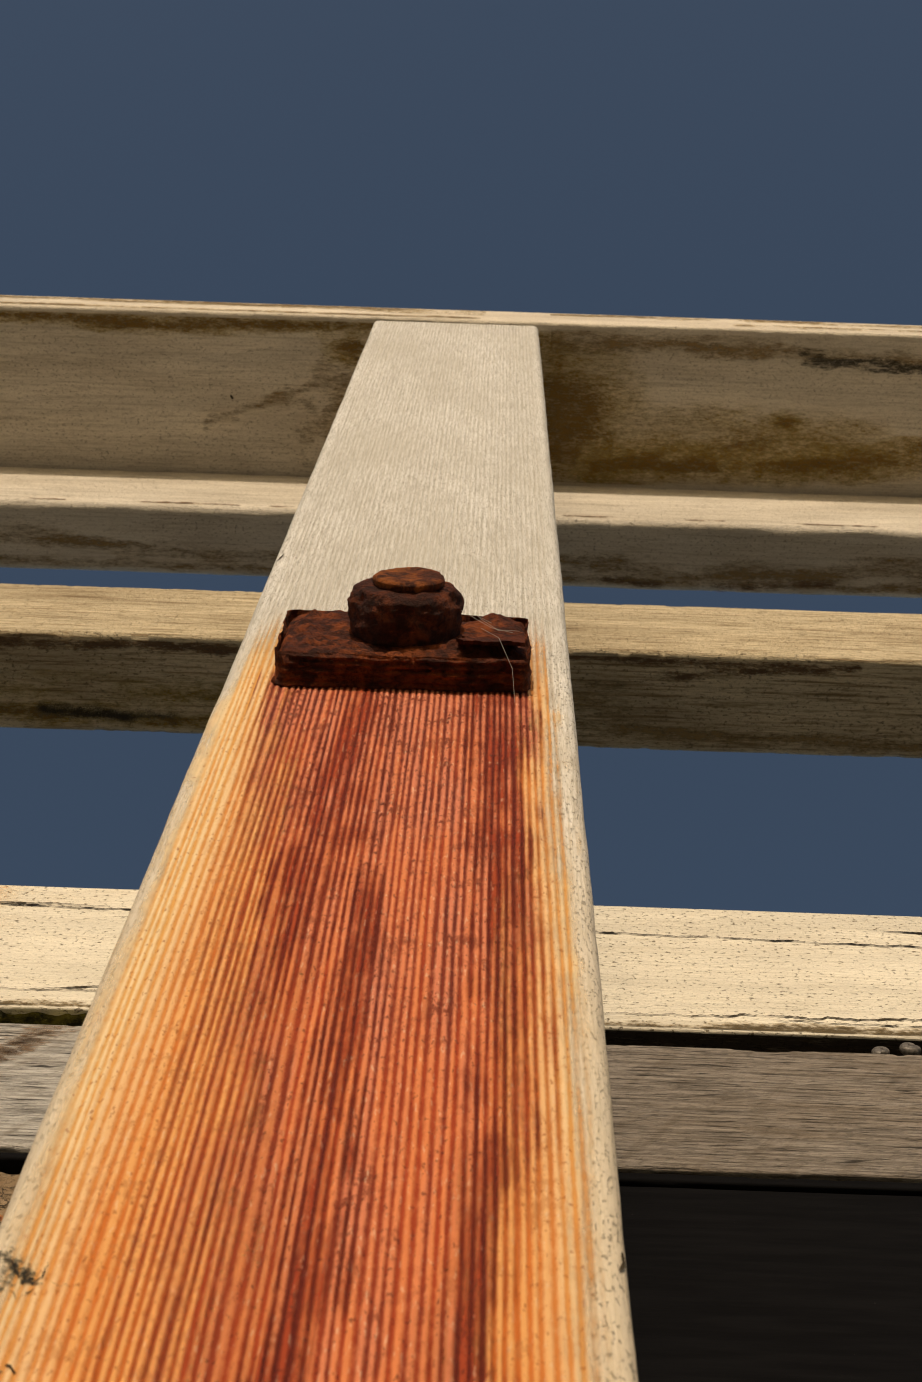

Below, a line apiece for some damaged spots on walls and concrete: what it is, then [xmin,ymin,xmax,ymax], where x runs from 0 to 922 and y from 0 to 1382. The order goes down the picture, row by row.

water stain [538,331,922,486]
crack [0,901,131,910]
crack [595,930,922,947]
crack [0,984,99,992]
rust [0,627,594,1382]
crack [607,1012,922,1027]
water stain [0,1025,80,1060]
crack [0,1246,74,1298]